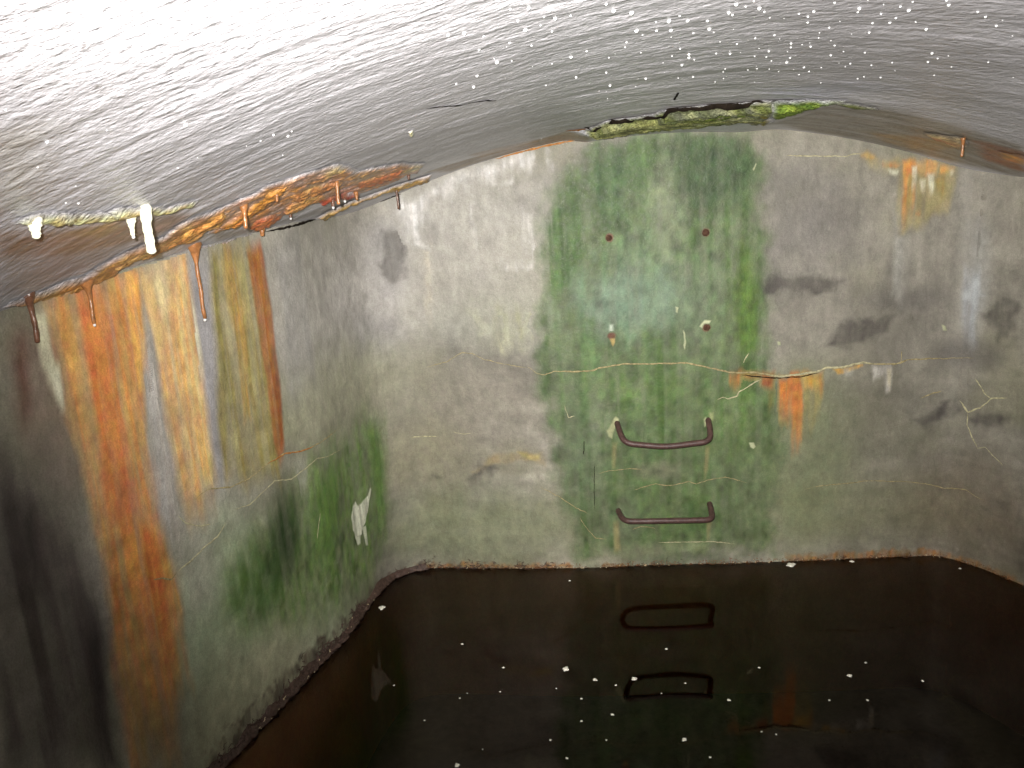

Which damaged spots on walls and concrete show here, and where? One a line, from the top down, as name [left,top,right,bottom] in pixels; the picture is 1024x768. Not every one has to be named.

crack [427,100,496,109]
crack [496,93,793,159]
corrosion [857,147,961,241]
damp [3,146,556,422]
damp [819,203,907,379]
damp [957,260,1024,357]
crack [429,351,950,399]
corrosion [727,361,865,462]
crack [920,380,1005,464]
corrosion [44,233,287,768]
damp [219,446,343,645]
damp [747,545,1024,591]